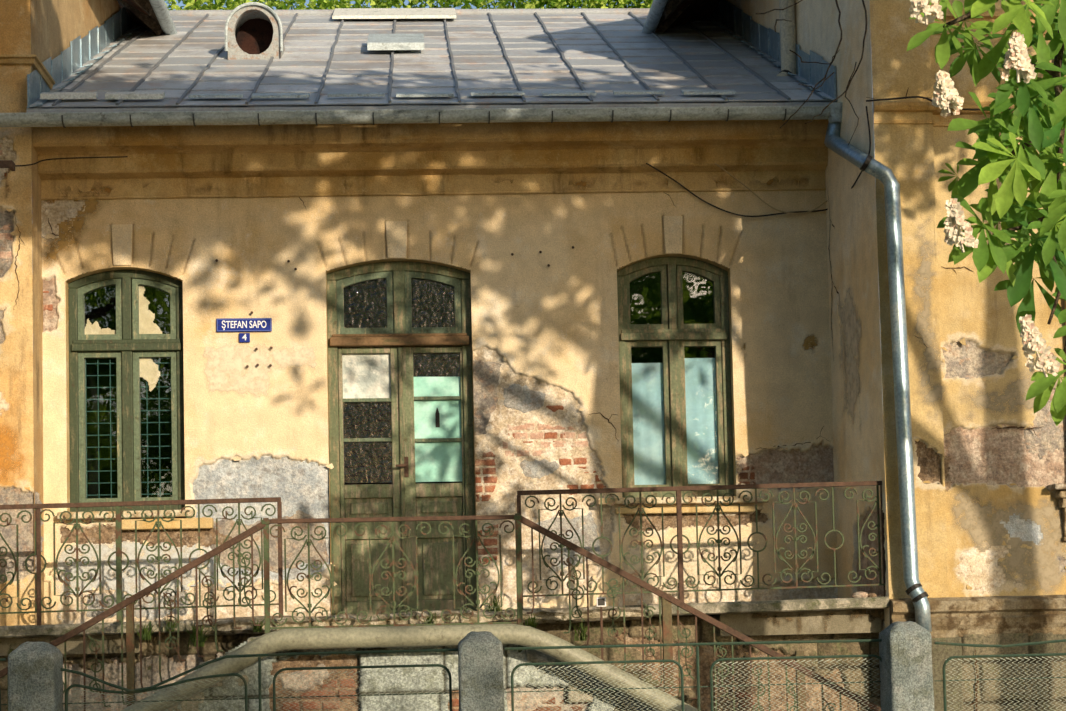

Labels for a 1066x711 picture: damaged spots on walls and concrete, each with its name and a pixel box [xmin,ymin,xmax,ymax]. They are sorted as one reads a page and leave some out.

spalling [0,137,16,185]
spalling [0,208,18,278]
spalling [41,200,85,239]
spalling [941,338,1019,381]
spalling [473,347,769,607]
spalling [735,442,834,491]
spalling [915,388,1066,491]
spalling [0,487,44,586]
spalling [60,453,337,624]
peeling [954,509,1044,595]